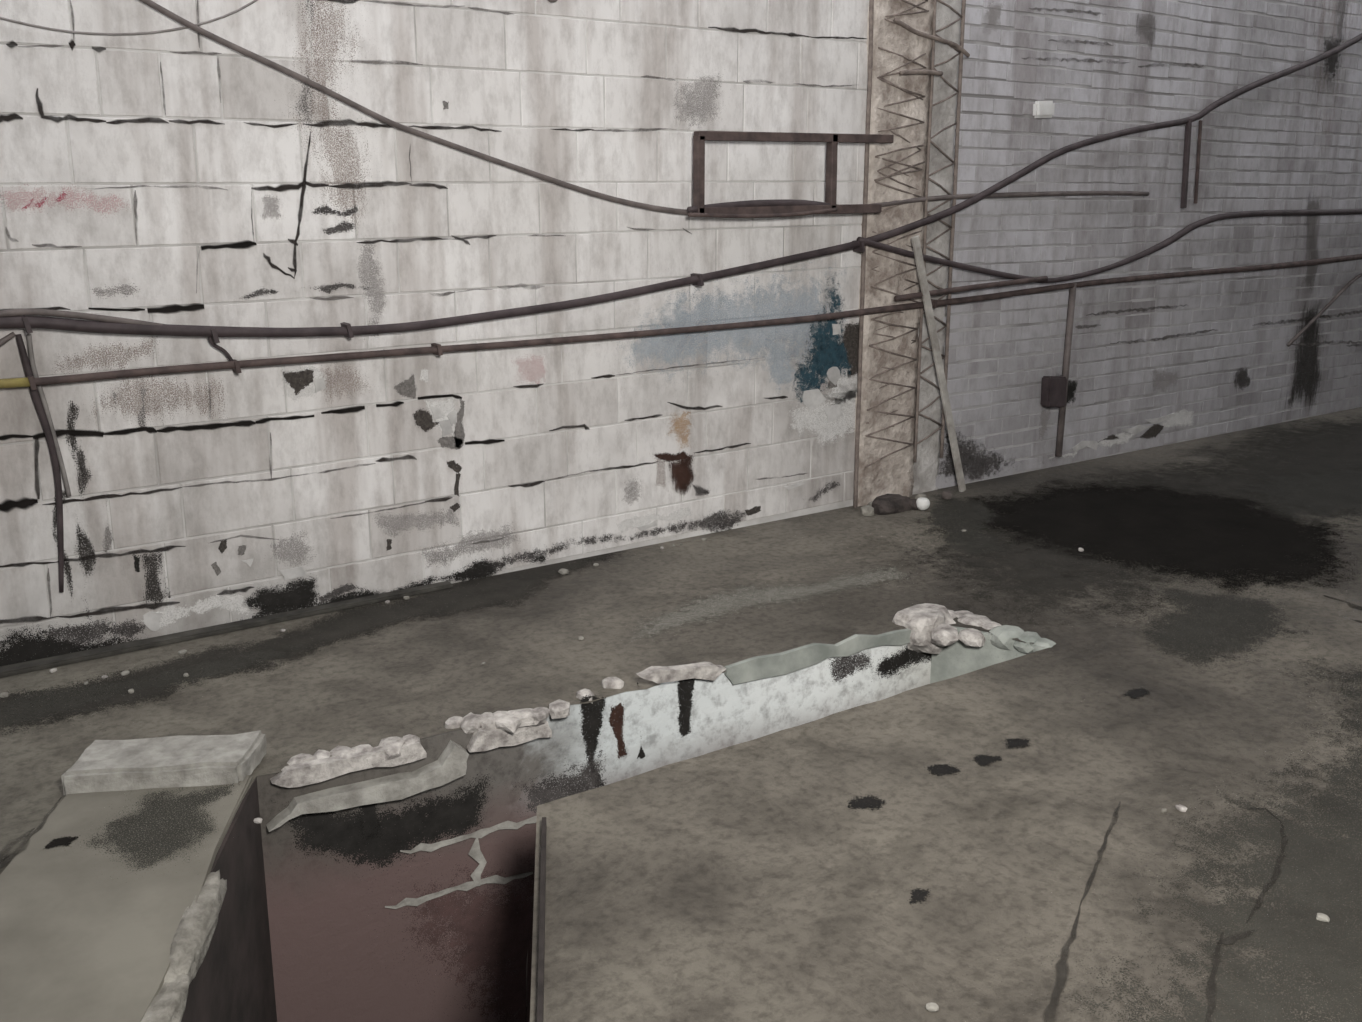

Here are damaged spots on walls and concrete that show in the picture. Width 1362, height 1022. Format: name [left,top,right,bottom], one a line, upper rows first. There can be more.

crack [0,0,513,300]
water stain [282,0,386,340]
water stain [616,257,853,407]
water stain [0,367,227,667]
crack [0,535,279,624]
crack [0,394,462,505]
water stain [240,507,746,620]
crack [509,461,658,487]
rust [649,410,709,496]
water stain [275,694,645,1022]
spalling [181,626,1026,1022]
crack [1045,803,1120,1018]